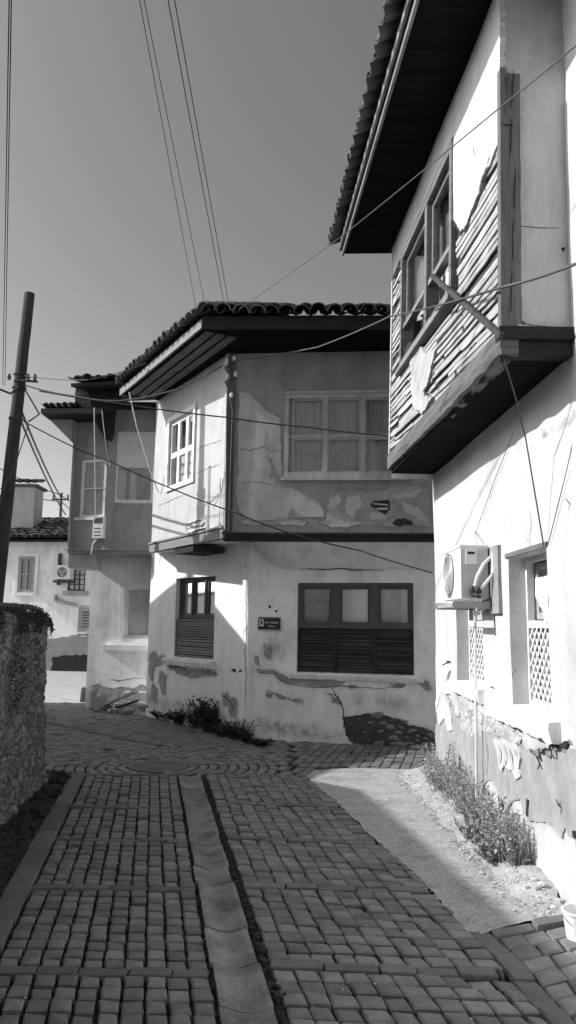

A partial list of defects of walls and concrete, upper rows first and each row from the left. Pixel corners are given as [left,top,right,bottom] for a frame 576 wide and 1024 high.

spalling [452,157,489,235]
crack [197,431,283,488]
peeling [235,391,432,528]
flaking render [90,651,217,708]
spalling [254,644,405,705]
crack [331,686,407,738]
flaking render [419,661,576,844]